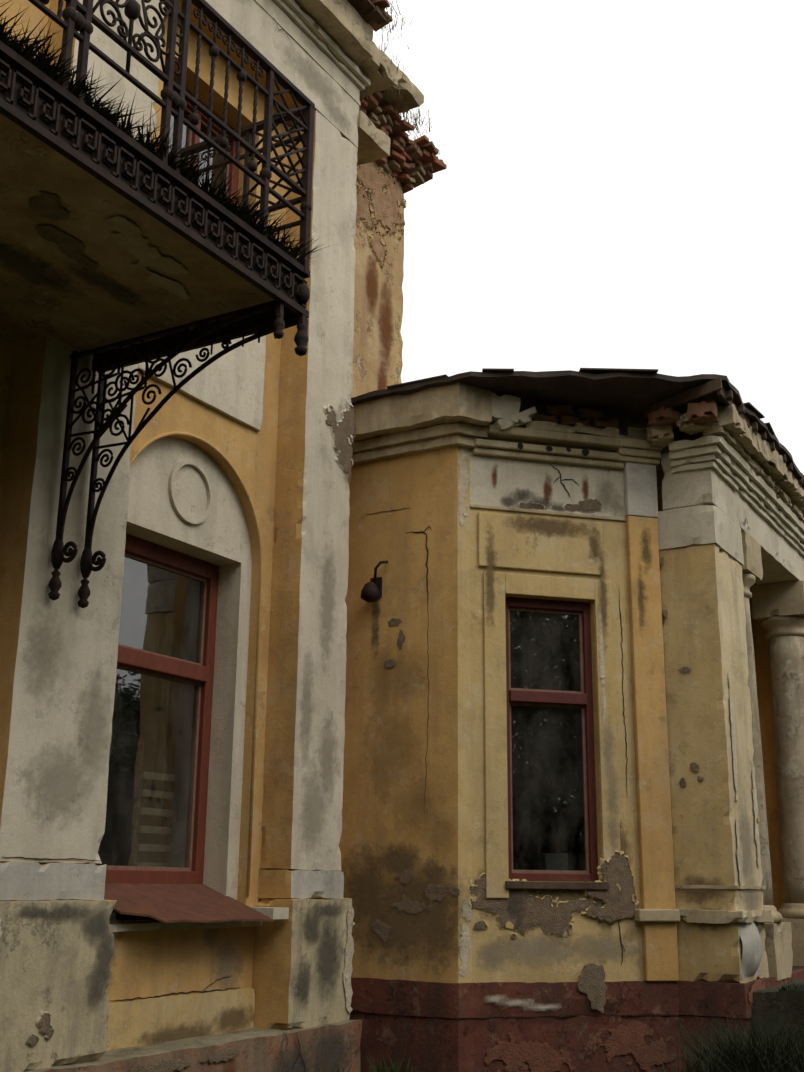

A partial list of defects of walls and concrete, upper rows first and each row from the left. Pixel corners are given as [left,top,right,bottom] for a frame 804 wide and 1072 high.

flaking render [356,161,407,268]
peeling [323,399,356,475]
flaking render [561,497,604,514]
flaking render [384,618,405,668]
crack [368,508,431,805]
crack [110,975,240,1001]
damp [299,903,340,1000]
damp [347,846,469,962]
flaking render [391,850,639,977]
spalling [578,963,608,1013]